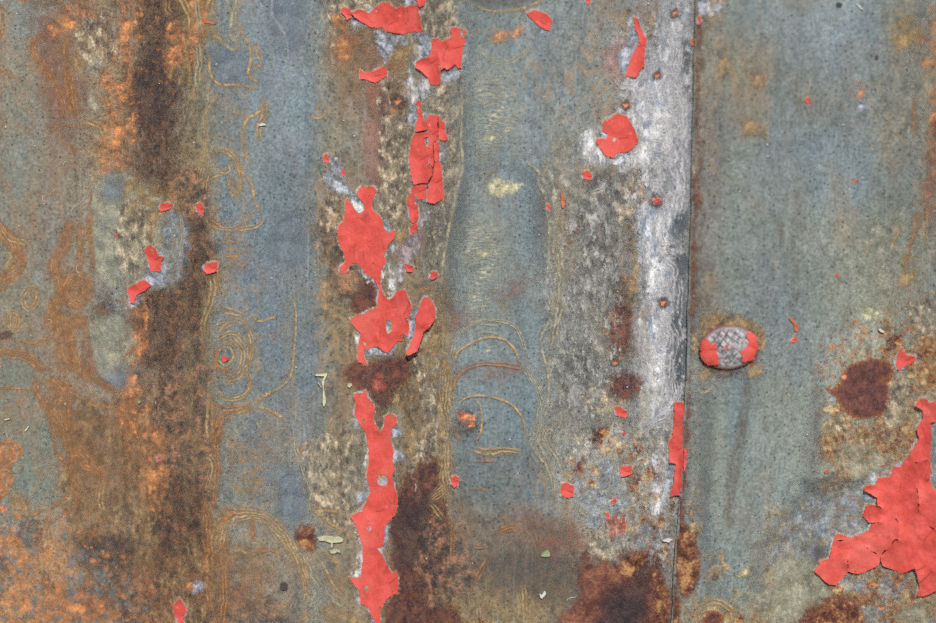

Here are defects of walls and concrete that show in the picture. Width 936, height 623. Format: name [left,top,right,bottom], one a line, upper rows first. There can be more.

rust [374,30,432,124]
peeling [415,25,467,86]
rust [442,68,465,124]
peeling [596,99,639,158]
peeling [624,14,648,78]
rust [0,0,229,623]
peeling [336,184,437,366]
rust [543,0,936,623]
rust [293,525,317,552]
peeling [348,389,399,623]
peeling [667,400,687,497]
peeling [812,396,936,597]